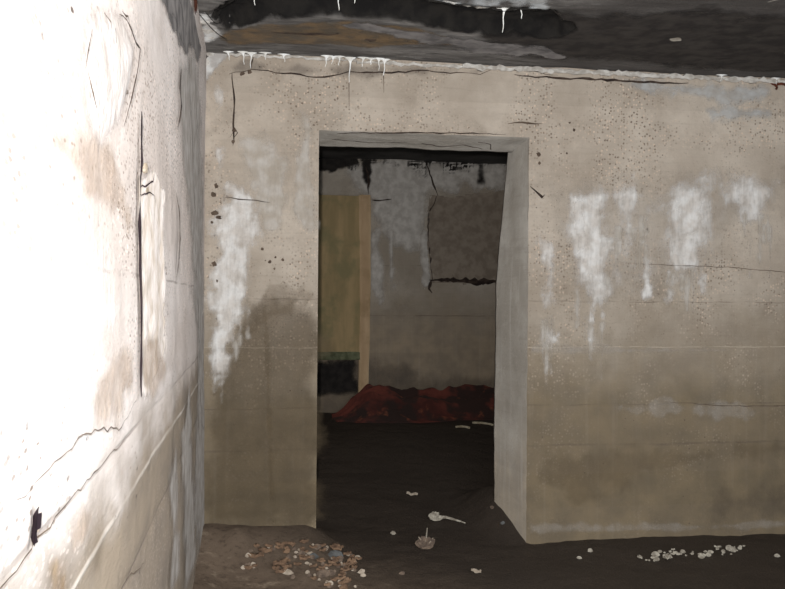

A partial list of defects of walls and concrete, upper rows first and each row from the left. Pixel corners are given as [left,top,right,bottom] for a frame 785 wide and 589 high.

crack [230,59,490,144]
spalling [212,0,577,39]
crack [0,11,156,589]
crack [333,121,541,293]
water stain [162,0,785,586]